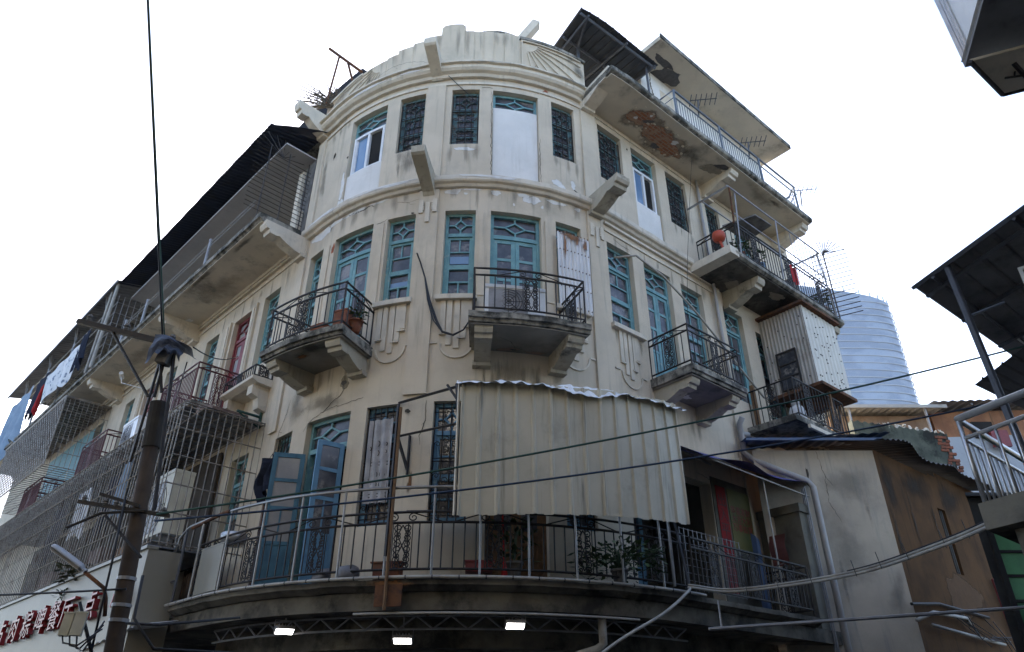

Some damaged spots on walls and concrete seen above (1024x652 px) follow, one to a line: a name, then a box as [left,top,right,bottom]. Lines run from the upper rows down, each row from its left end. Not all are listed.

spalling [650,53,680,87]
spalling [621,106,687,159]